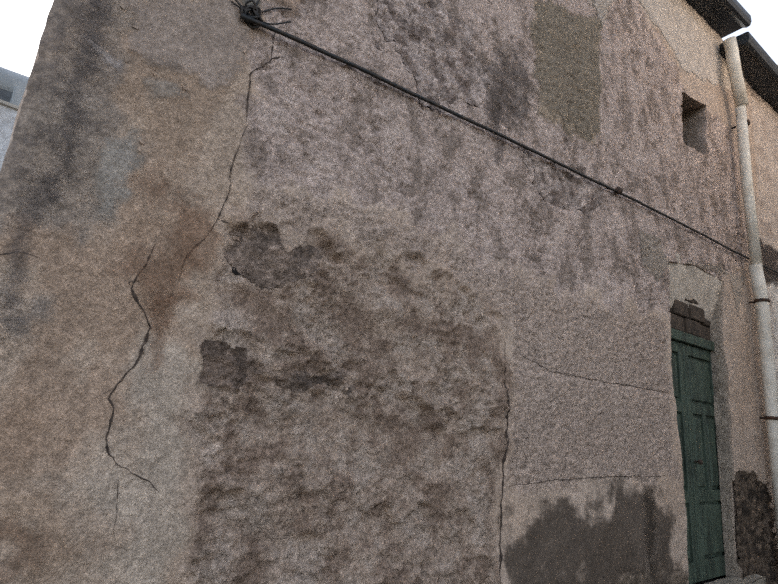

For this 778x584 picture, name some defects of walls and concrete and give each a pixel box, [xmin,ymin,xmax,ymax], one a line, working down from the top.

crack [179,33,285,281]
spalling [225,222,323,291]
crack [97,239,157,533]
spalling [199,335,356,397]
water stain [505,481,676,584]
spalling [732,469,778,584]